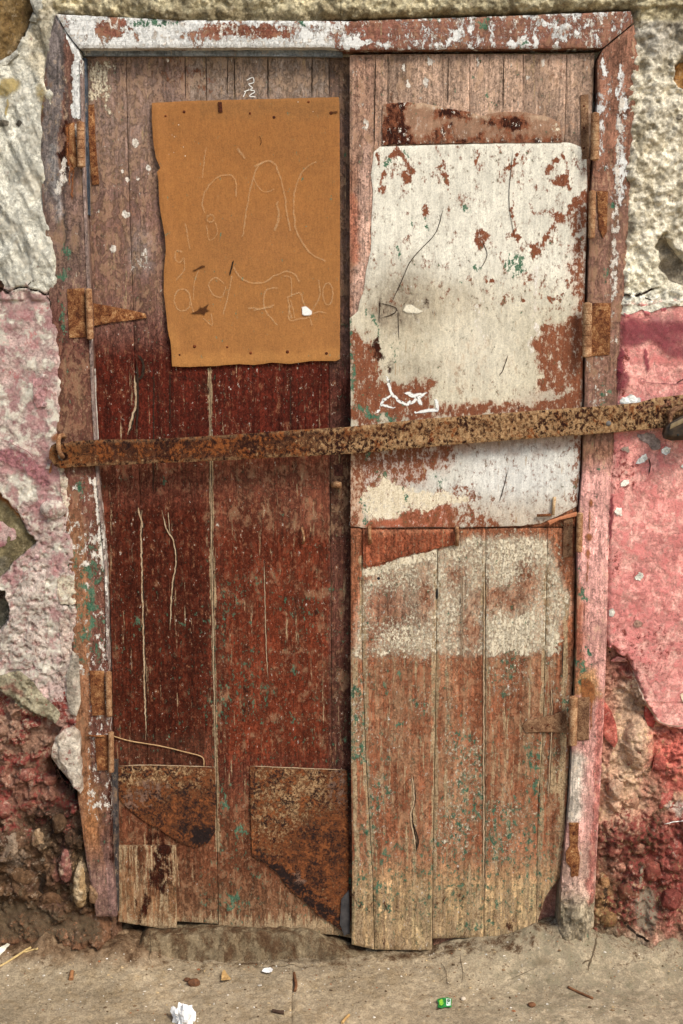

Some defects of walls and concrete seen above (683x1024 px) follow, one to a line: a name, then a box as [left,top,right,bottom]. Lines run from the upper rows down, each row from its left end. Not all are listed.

spalling [657,237,683,285]
spalling [0,495,112,951]
spalling [593,645,683,948]